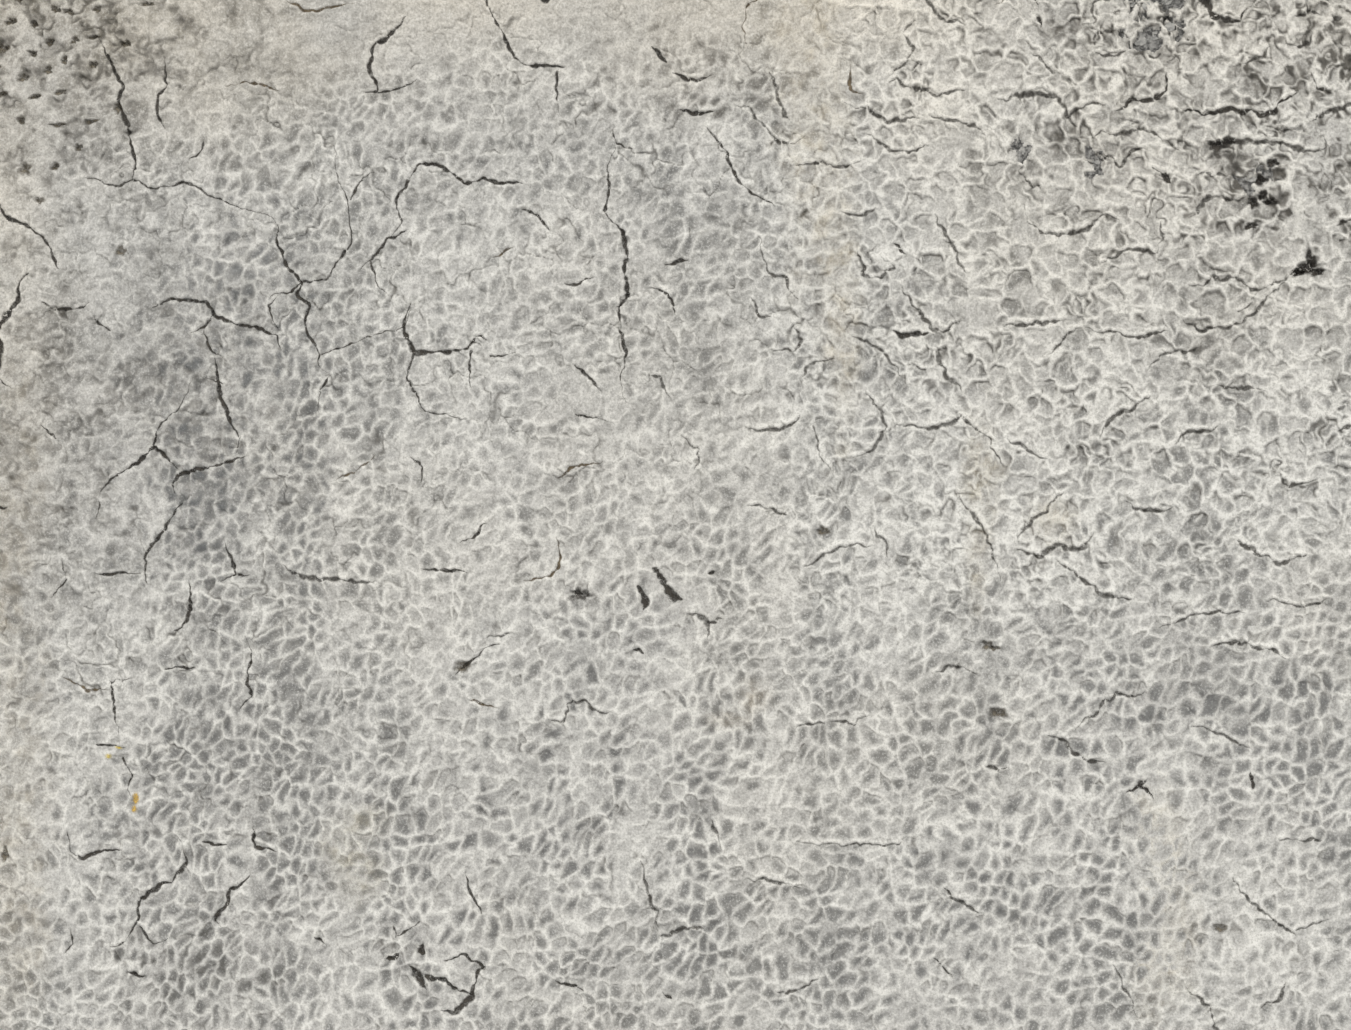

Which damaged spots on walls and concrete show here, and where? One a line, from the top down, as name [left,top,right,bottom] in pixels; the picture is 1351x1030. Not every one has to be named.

crack [365,16,412,93]
crack [486,0,564,115]
crack [0,205,110,385]
crack [89,43,550,583]
crack [564,133,688,422]
crack [529,537,562,581]
crack [111,829,274,977]
crack [387,921,488,1015]